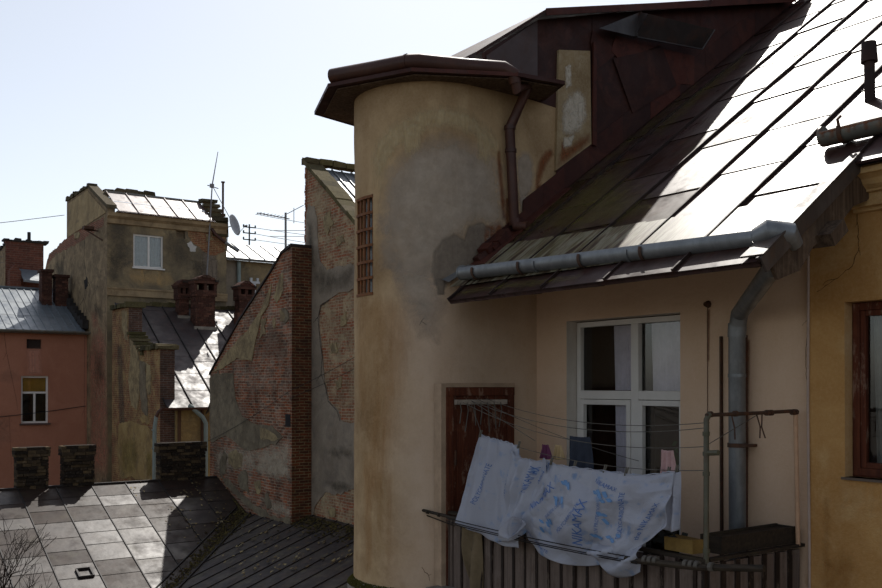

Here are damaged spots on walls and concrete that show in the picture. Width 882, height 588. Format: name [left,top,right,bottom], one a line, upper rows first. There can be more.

spalling [187,231,226,256]
leakage [375,109,498,329]
peeling [121,310,152,410]
peeling [209,284,291,524]
spalling [320,290,355,423]
spalling [314,489,354,525]